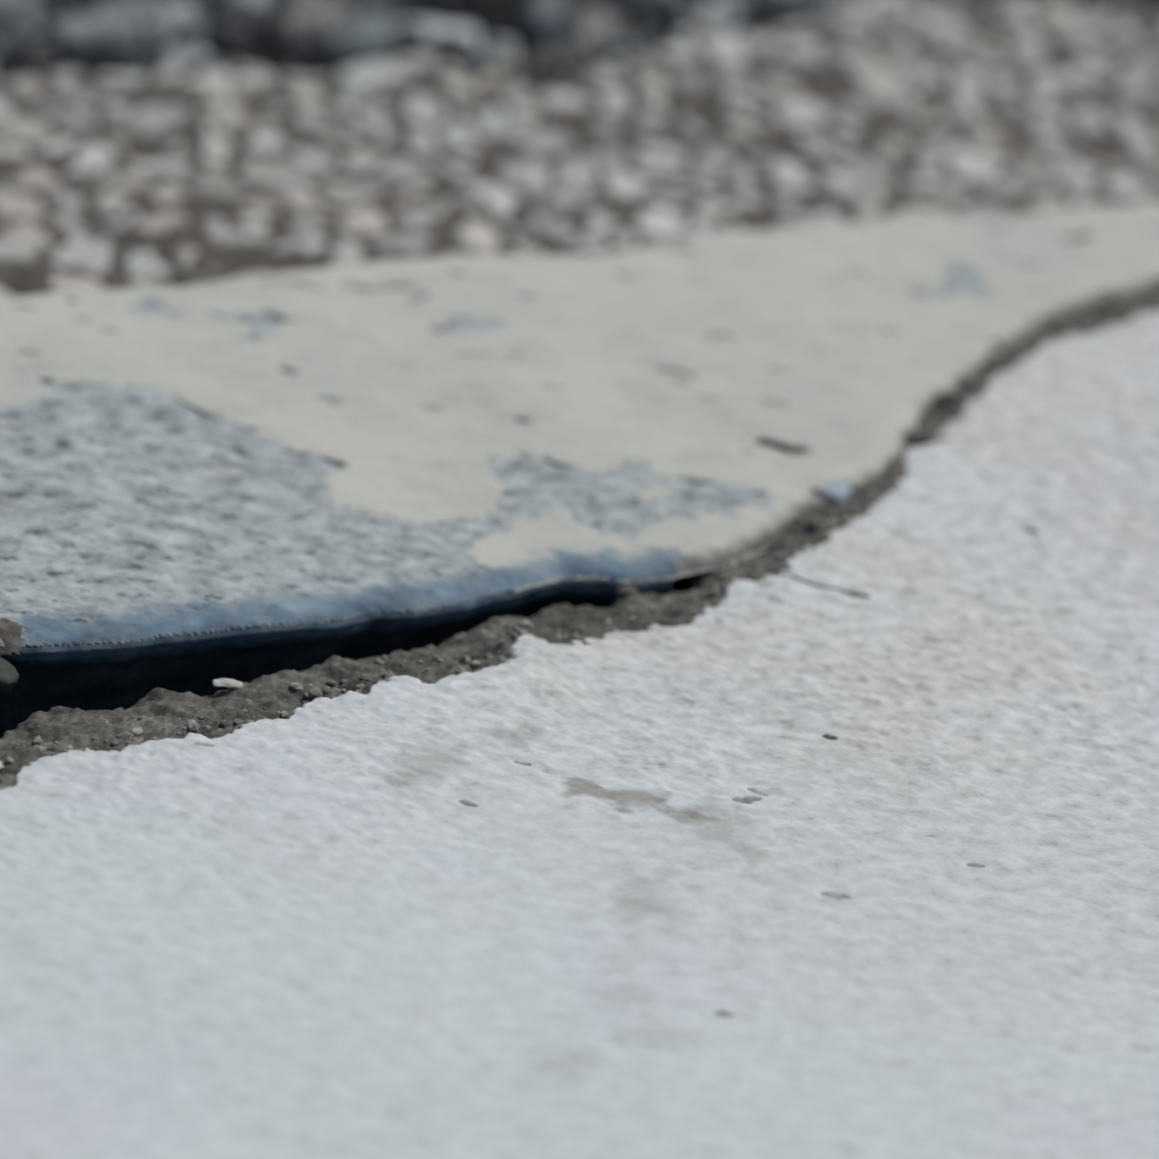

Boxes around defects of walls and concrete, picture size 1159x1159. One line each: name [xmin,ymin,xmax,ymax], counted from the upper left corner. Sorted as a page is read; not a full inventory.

peeling [0,378,773,647]
crack [0,278,1159,789]